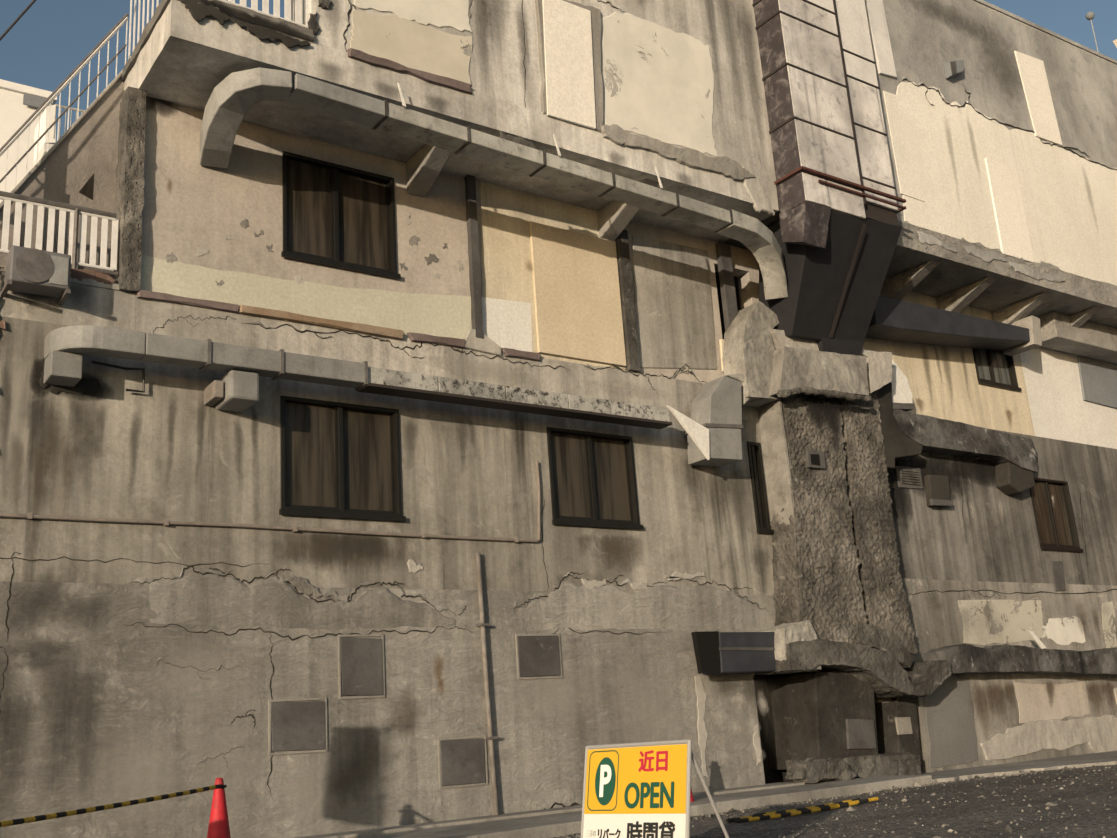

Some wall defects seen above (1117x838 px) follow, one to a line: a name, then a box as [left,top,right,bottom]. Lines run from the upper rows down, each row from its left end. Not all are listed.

peeling [181,0,332,48]
peeling [349,0,473,84]
peeling [601,12,756,182]
peeling [223,219,274,252]
peeling [424,243,448,279]
crack [153,315,706,393]
crack [0,552,473,769]
peeling [958,600,1086,645]
peeling [1102,601,1117,648]
spalling [980,681,1117,761]